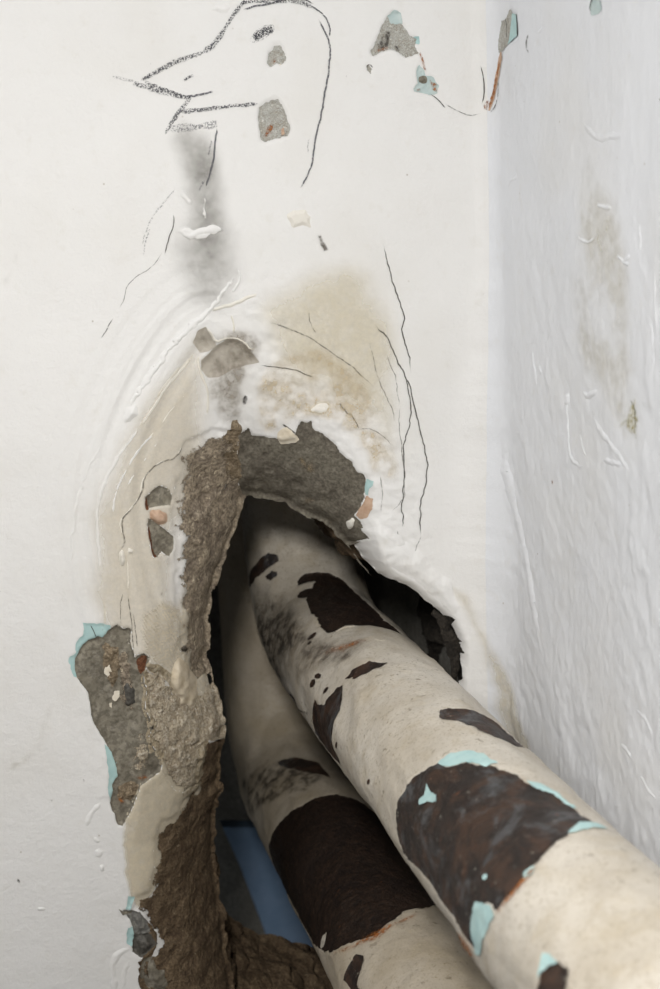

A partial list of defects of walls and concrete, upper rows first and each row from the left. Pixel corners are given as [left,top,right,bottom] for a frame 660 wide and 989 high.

peeling [267,45,286,67]
peeling [367,10,439,95]
peeling [484,10,518,111]
peeling [258,99,290,142]
damp [220,335,254,416]
damp [290,284,385,417]
spalling [417,596,464,683]
spalling [68,420,374,989]
peeling [419,784,436,805]